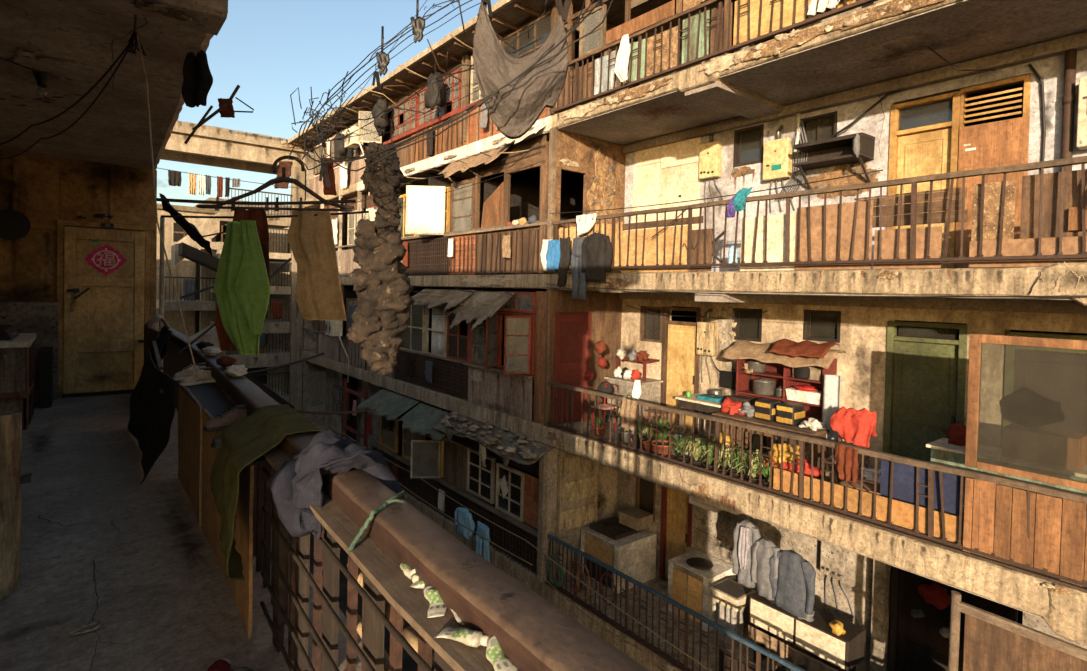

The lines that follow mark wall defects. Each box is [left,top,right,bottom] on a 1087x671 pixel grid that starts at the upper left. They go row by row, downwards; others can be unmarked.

spalling [698,0,944,76]